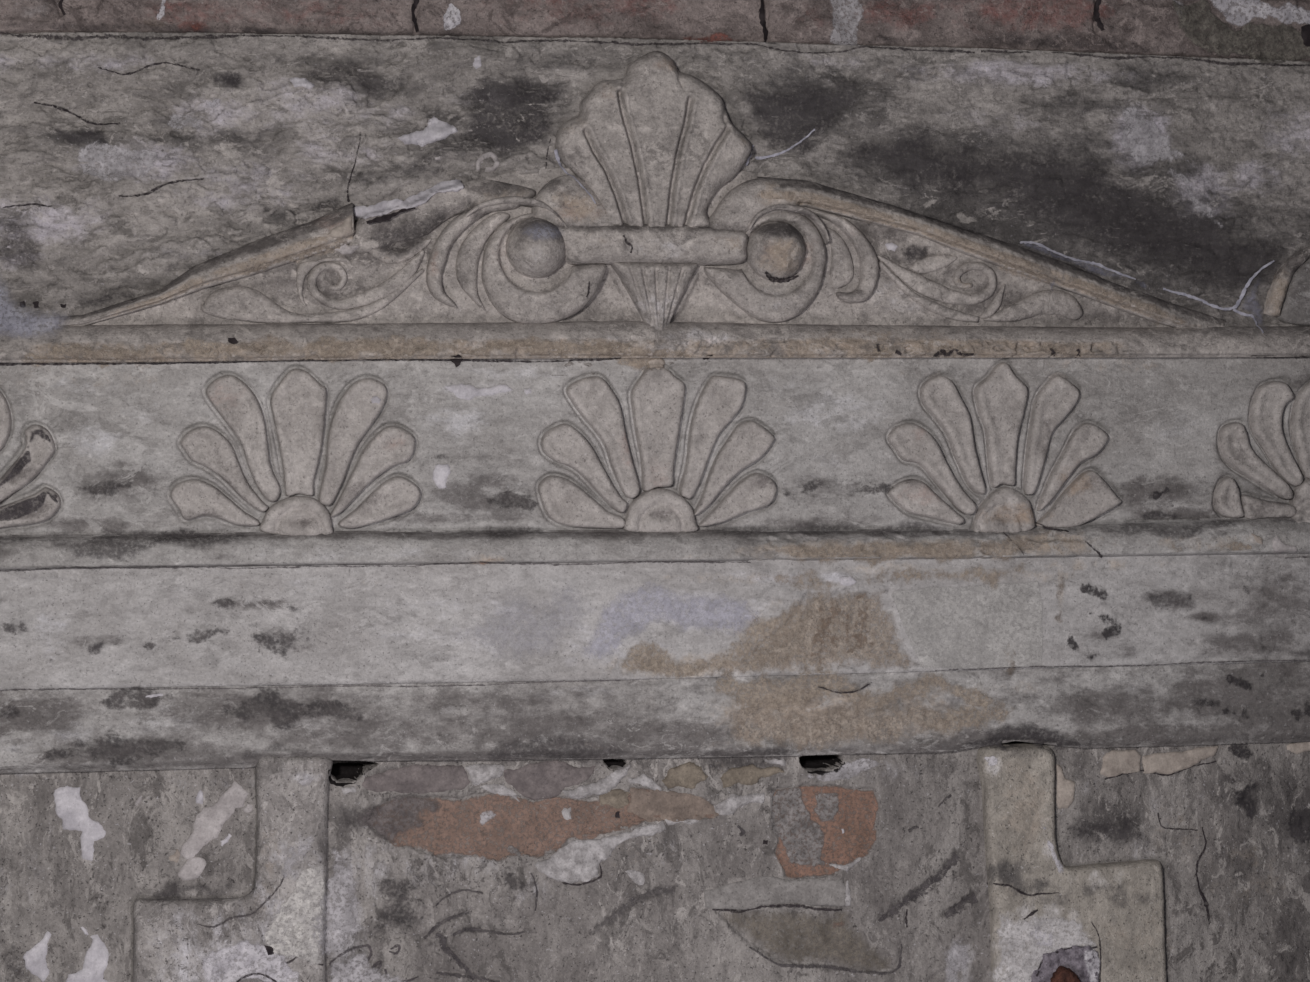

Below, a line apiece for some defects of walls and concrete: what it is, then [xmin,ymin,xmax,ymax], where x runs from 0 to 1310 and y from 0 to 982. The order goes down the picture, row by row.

spalling [327,179,464,254]
crack [0,357,621,366]
crack [1237,352,1310,360]
crack [0,561,751,572]
crack [0,680,619,698]
peeling [1100,746,1218,780]
peeling [53,785,106,861]
peeling [169,781,253,880]
flaking render [358,787,719,911]
peeling [23,931,51,982]
peeling [66,927,109,982]
crack [236,973,277,982]